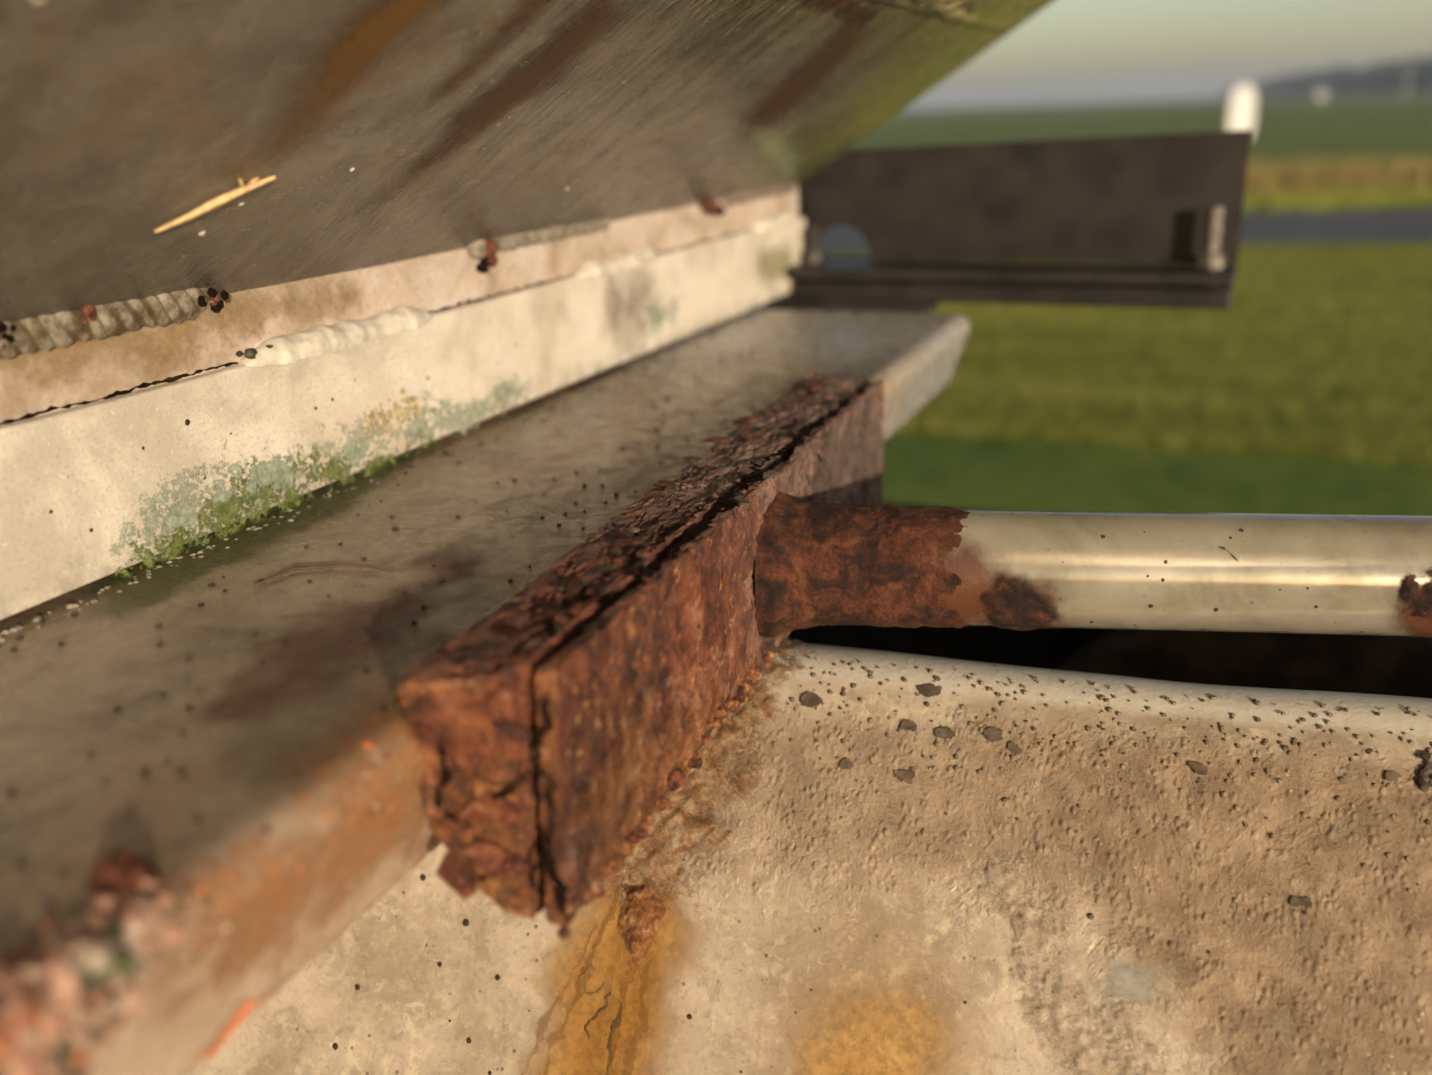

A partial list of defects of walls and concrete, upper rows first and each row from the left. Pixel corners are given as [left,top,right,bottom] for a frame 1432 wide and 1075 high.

corrosion [1398,570,1432,638]
corrosion [414,379,884,1075]
crack [585,990,623,1075]